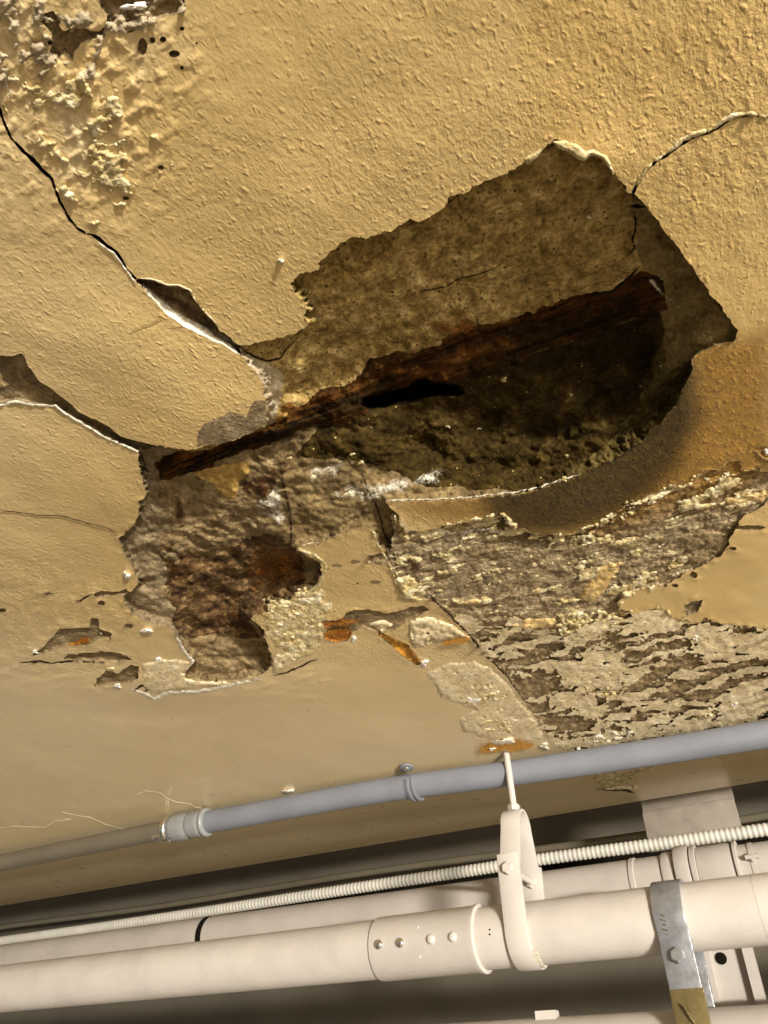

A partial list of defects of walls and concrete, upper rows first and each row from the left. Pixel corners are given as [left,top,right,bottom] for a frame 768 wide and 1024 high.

crack [632,111,768,194]
crack [0,107,241,355]
crack [0,354,155,453]
spalling [20,139,768,753]
rust [322,618,364,642]
rust [379,633,422,663]
rust [478,738,534,754]